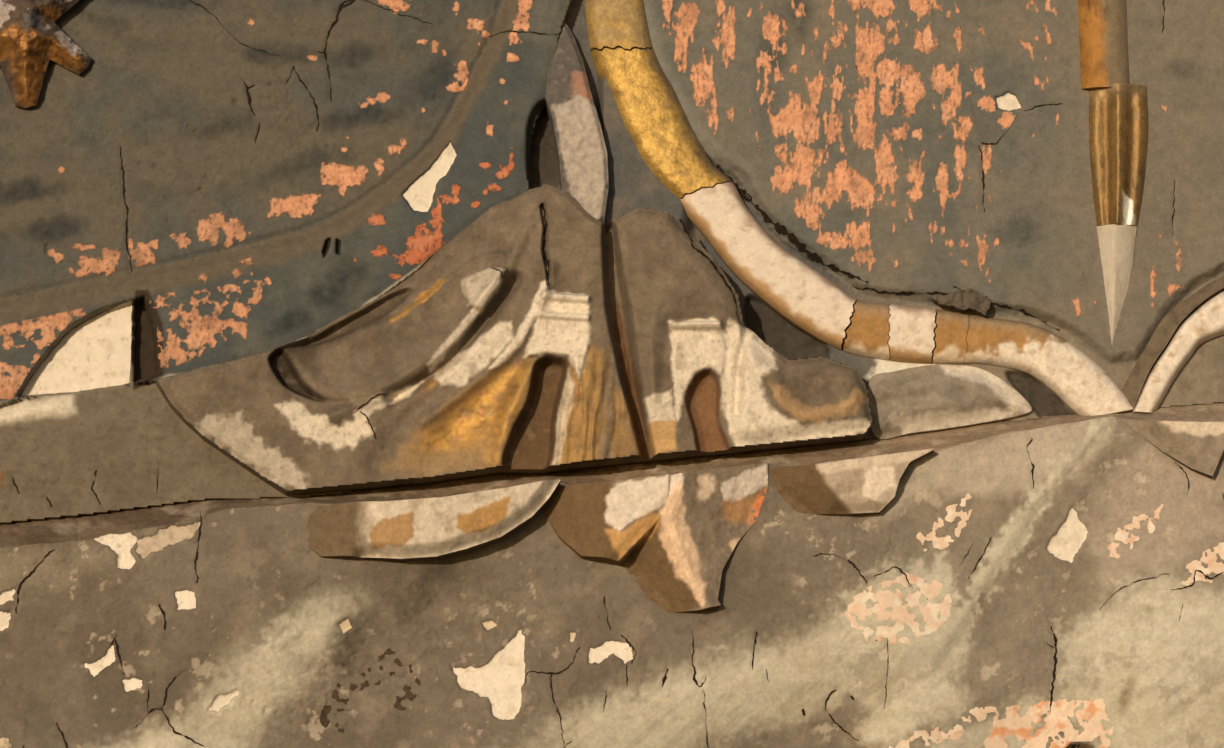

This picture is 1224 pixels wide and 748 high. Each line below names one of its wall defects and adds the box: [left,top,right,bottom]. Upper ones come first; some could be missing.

crack [189,0,432,127]
crack [243,81,259,141]
peeling [48,213,251,277]
peeling [267,136,407,218]
peeling [371,143,515,280]
peeling [662,0,1021,317]
spalling [0,301,132,400]
peeling [155,257,272,368]
peeling [1181,541,1224,586]
spalling [0,589,15,631]
spalling [453,630,525,720]
peeling [889,699,1114,748]